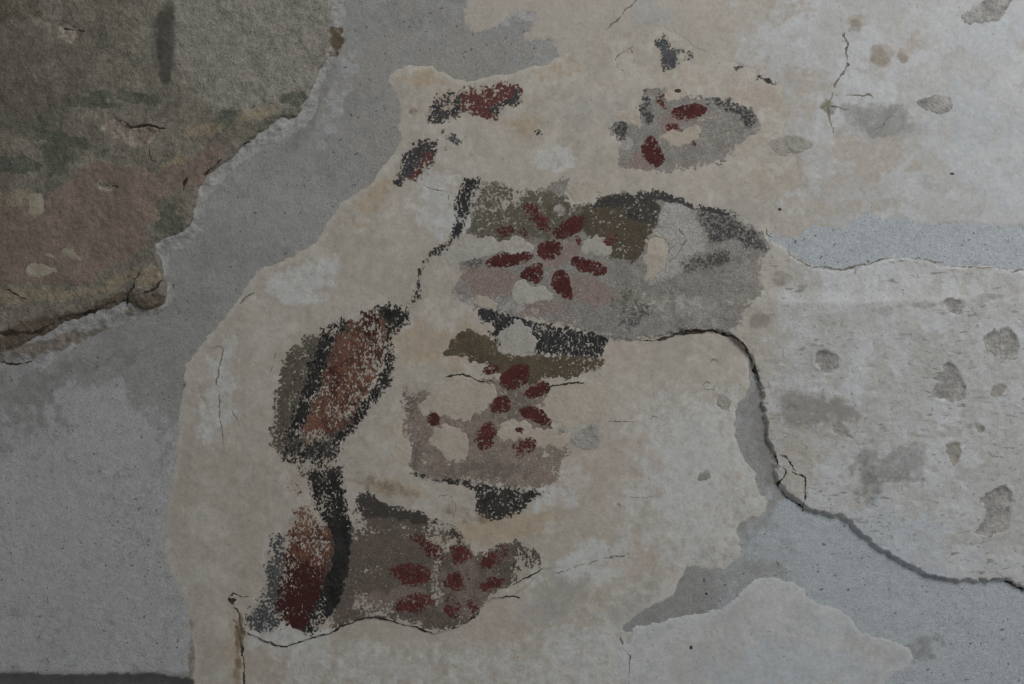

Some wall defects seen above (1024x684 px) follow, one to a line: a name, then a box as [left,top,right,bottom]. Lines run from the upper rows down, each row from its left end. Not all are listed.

spalling [961,0,1013,25]
crack [820,18,892,133]
spalling [916,95,954,115]
spalling [101,118,158,147]
peeling [25,248,82,277]
crack [637,329,760,390]
spalling [815,348,839,373]
spalling [982,328,1020,360]
spalling [931,361,967,403]
spalling [945,441,963,466]
crack [774,452,807,511]
spalling [975,485,1014,537]